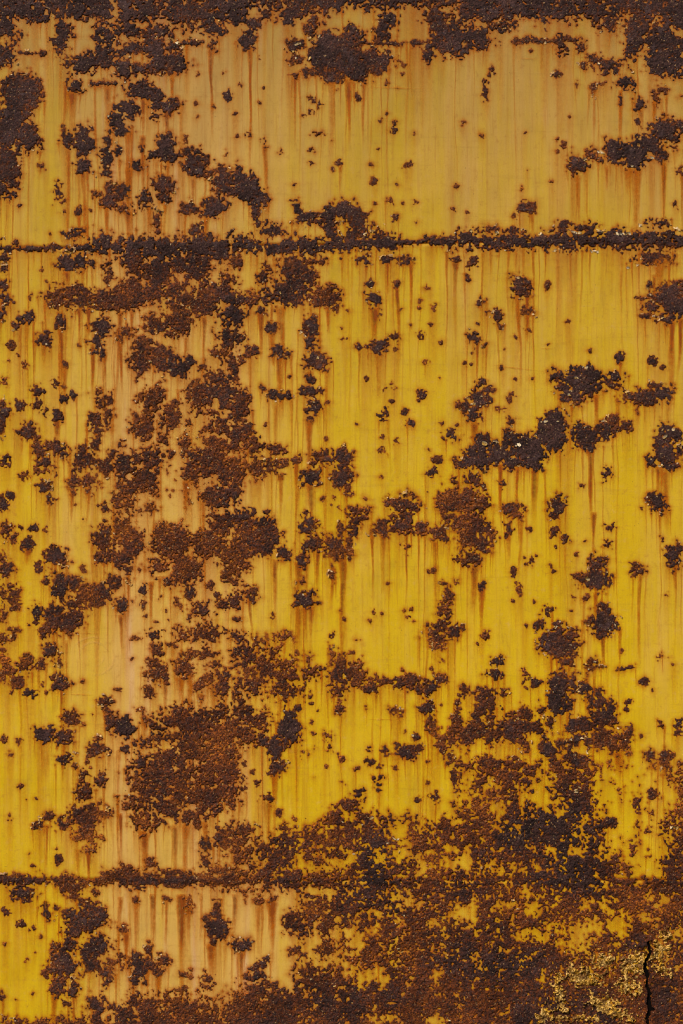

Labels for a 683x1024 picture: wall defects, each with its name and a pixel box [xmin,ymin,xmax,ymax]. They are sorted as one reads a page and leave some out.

corrosion [511,199,537,222]
corrosion [354,277,401,362]
corrosion [59,389,78,404]
corrosion [0,491,16,513]
corrosion [365,351,683,619]
corrosion [0,518,48,557]
corrosion [353,746,385,793]
corrosion [646,787,663,803]
corrosion [628,819,653,857]
corrosion [162,894,196,954]
peeling [534,923,674,1024]
crack [643,941,655,1024]